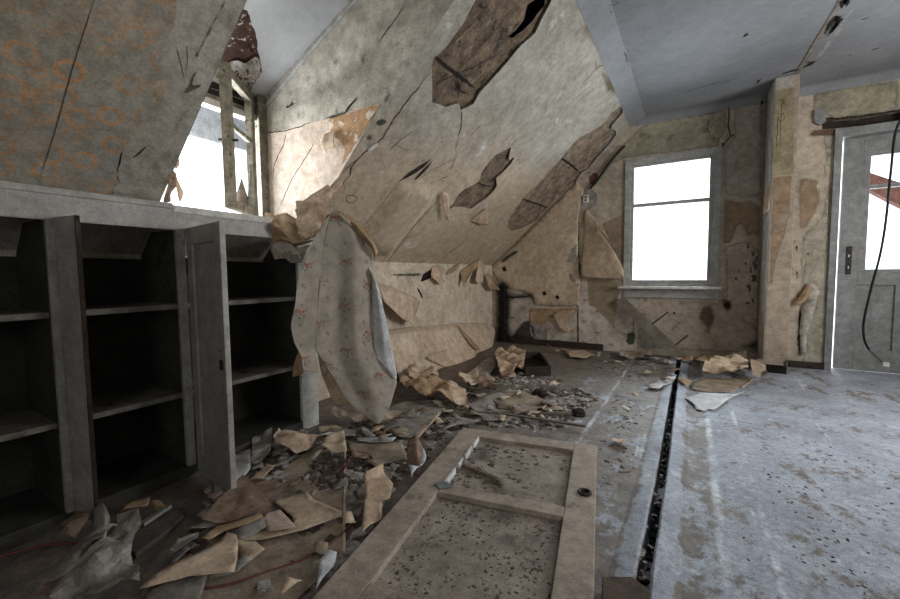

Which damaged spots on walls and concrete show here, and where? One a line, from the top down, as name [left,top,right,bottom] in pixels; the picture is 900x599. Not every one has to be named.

spalling [215,9,262,90]
peeling [327,105,379,164]
crack [343,74,429,203]
spalling [449,145,516,211]
spalling [428,0,554,113]
spalling [506,106,624,232]
peeling [611,104,761,352]
crack [685,78,785,148]
peeling [770,75,829,363]
leakage [700,306,714,329]